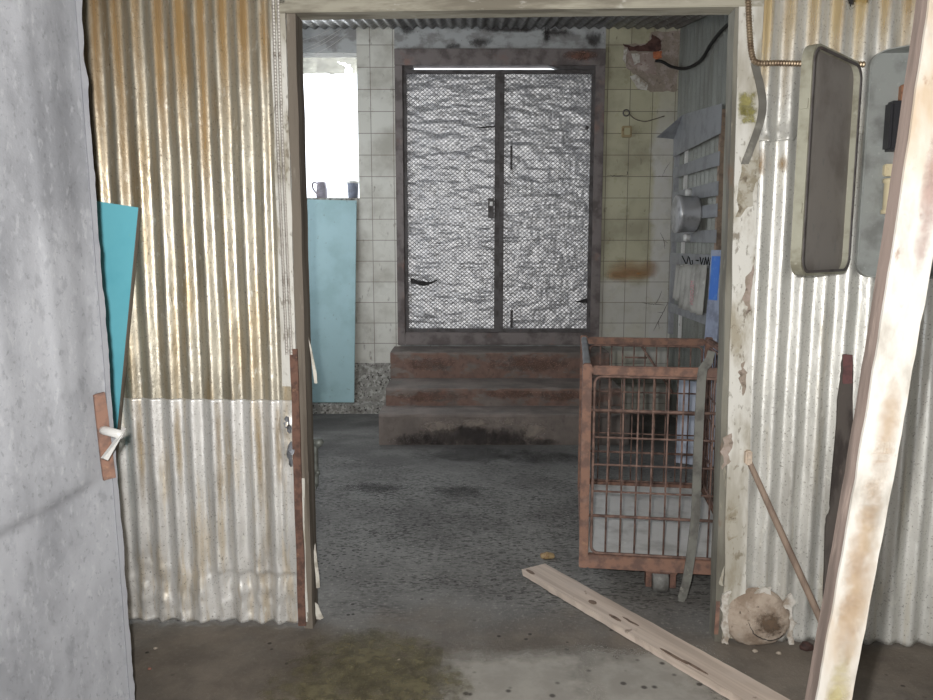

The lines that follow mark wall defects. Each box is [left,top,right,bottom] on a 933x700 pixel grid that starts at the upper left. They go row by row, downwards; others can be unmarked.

spalling [623,30,680,92]
peeling [736,156,760,217]
peeling [742,264,754,315]
peeling [738,362,747,395]
damp [399,428,569,461]
peeling [720,433,733,469]